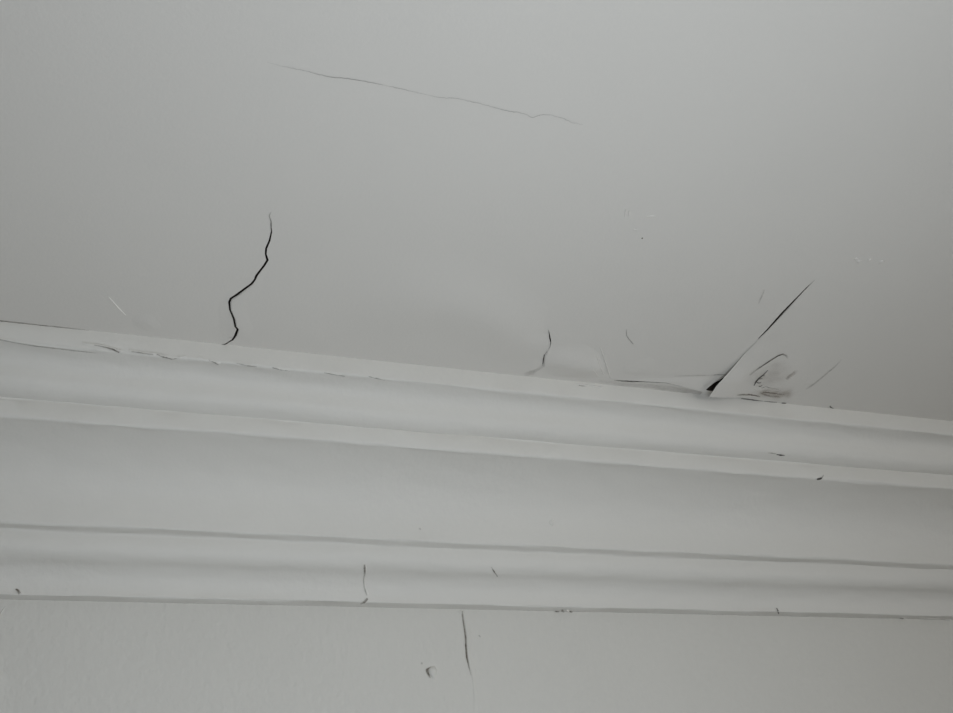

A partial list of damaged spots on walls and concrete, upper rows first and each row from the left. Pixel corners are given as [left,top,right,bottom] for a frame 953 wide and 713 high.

crack [219,223,272,345]
peeling [706,284,821,402]